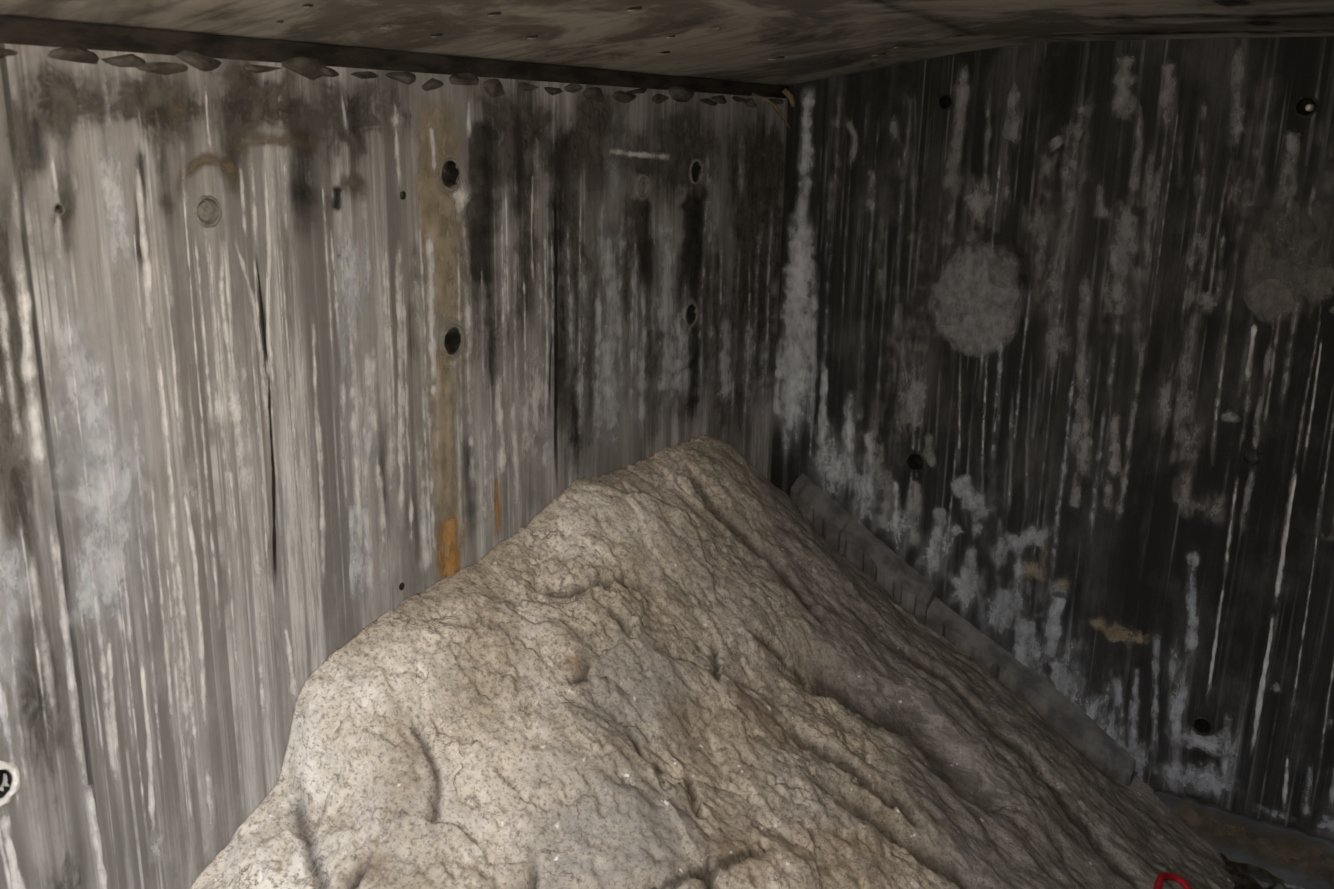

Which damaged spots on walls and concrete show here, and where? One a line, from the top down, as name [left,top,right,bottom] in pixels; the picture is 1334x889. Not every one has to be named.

rust [416,106,465,321]
water stain [1229,51,1245,141]
water stain [1277,133,1299,216]
water stain [0,62,438,889]
rust [426,351,466,577]
water stain [453,57,1238,798]
water stain [1156,151,1301,561]
water stain [1276,322,1321,596]
rust [1090,619,1146,643]
water stain [1253,591,1310,743]
water stain [1272,759,1288,818]
water stain [1318,771,1334,832]